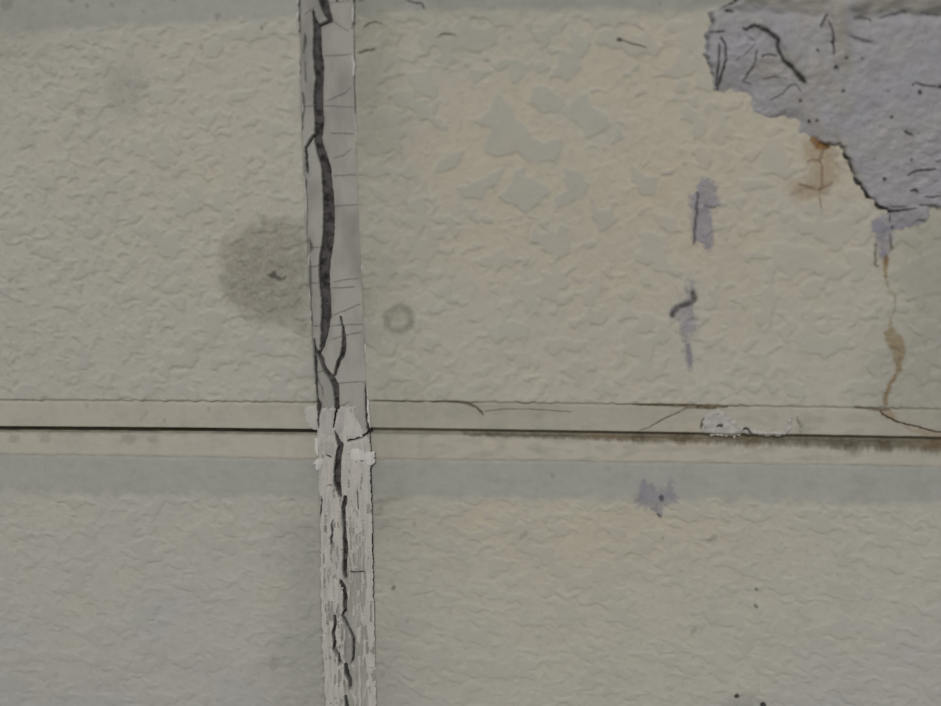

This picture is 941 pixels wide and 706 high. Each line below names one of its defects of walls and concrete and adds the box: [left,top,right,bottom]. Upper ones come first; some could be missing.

crack [299,0,372,706]